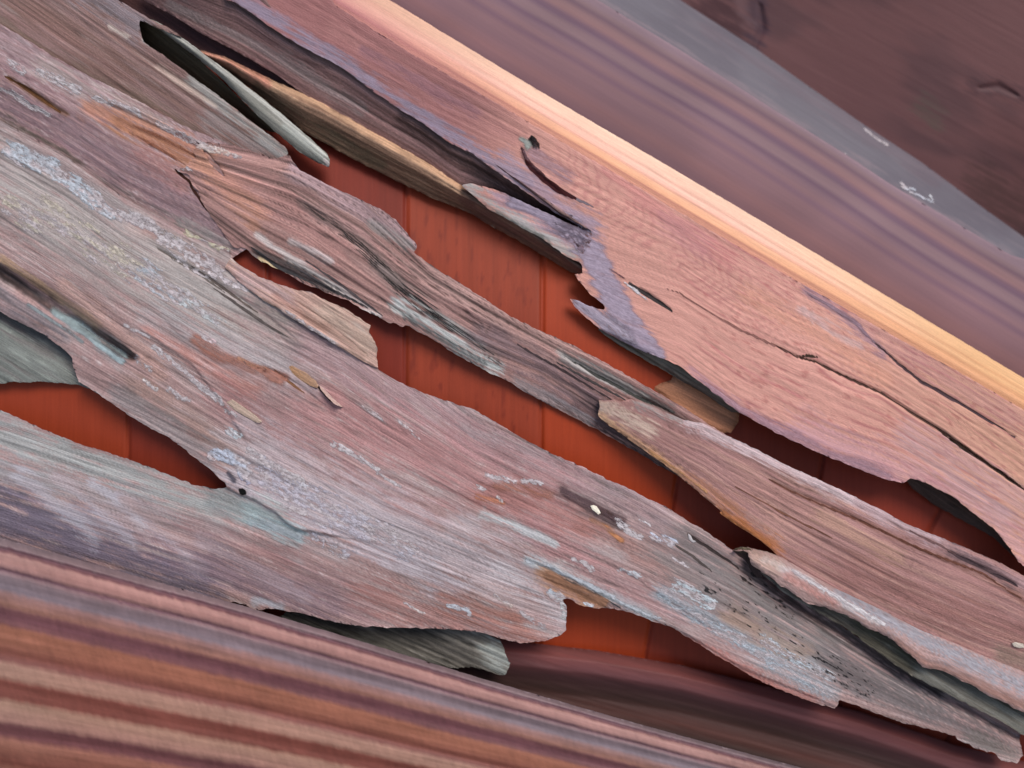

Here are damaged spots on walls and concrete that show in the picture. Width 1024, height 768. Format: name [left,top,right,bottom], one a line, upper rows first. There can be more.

peeling [196,142,242,158]
crack [520,147,593,207]
peeling [208,258,378,367]
peeling [134,354,190,402]
crack [609,268,1024,490]
peeling [760,633,837,681]